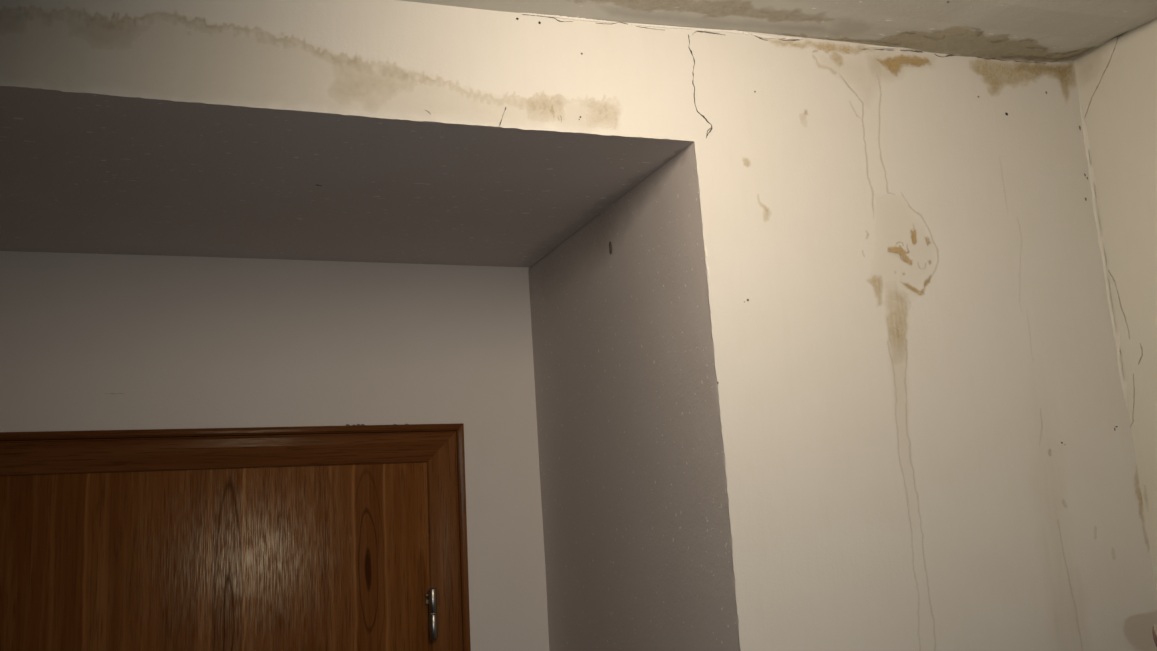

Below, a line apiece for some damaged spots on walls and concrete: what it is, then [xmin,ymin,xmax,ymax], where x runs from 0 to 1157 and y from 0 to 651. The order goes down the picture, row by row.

crack [522,14,661,30]
crack [688,31,724,138]
peeling [888,231,929,264]